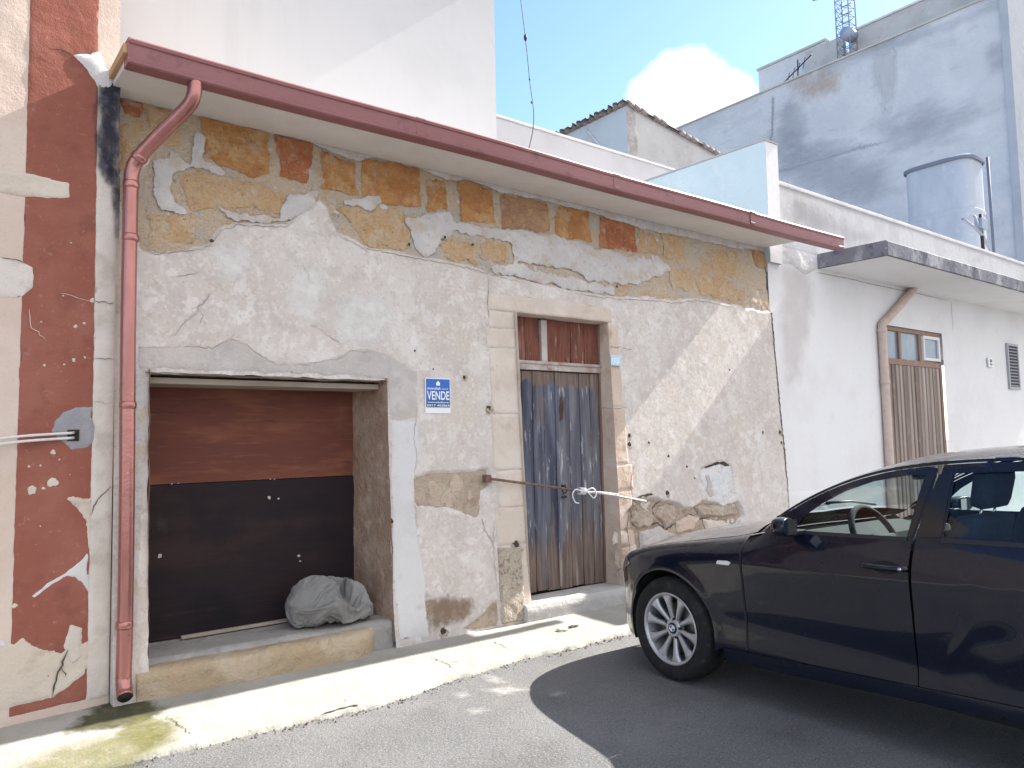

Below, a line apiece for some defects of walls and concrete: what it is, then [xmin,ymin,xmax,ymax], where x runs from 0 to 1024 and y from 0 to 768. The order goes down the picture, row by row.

damp [96,83,121,236]
spalling [118,98,173,208]
spalling [138,108,769,311]
crack [142,221,377,366]
peeling [27,477,59,495]
flaking render [414,469,489,518]
flaking render [700,460,734,503]
peeling [32,496,92,597]
crack [52,650,68,698]
damp [67,701,160,731]